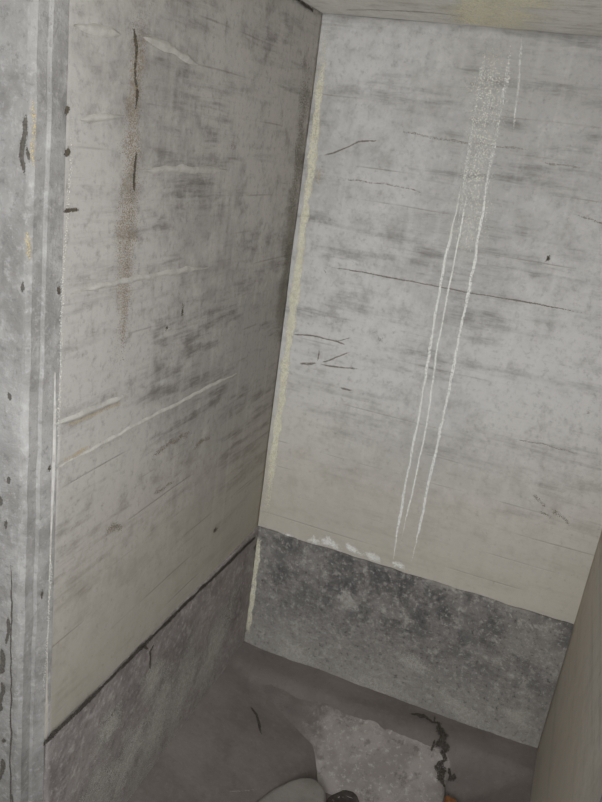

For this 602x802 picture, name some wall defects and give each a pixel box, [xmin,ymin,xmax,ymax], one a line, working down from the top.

leakage [393,40,523,574]
crack [409,713,457,796]